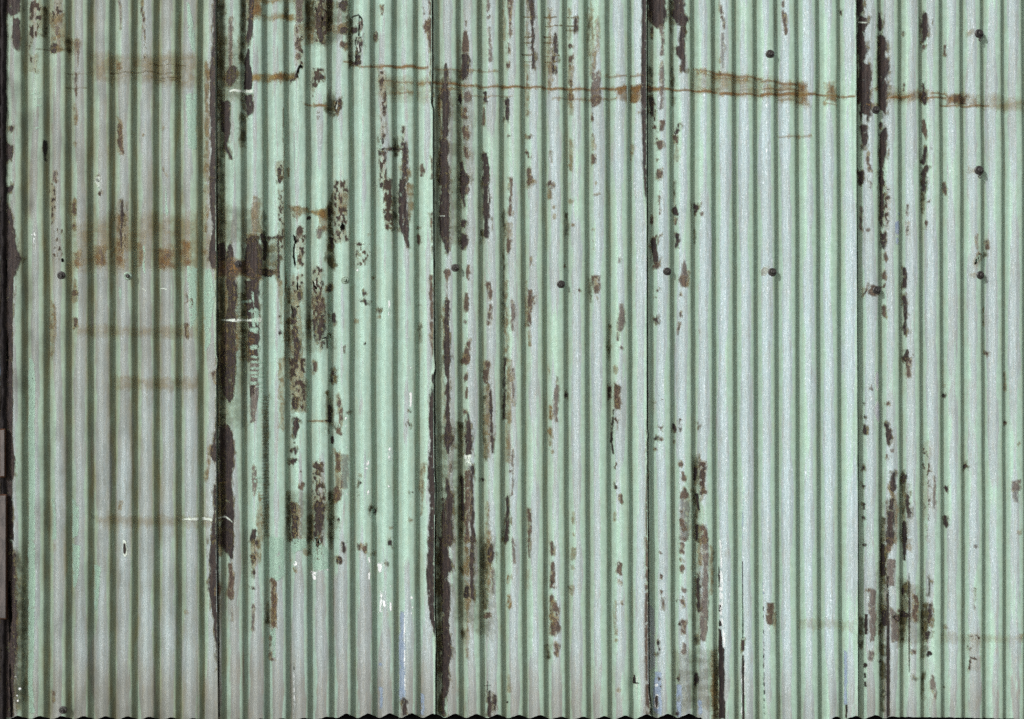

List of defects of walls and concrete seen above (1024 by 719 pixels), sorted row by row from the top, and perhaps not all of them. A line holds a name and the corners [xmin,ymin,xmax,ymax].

rust [0,0,80,96]
rust [0,84,14,163]
rust [337,0,982,318]
rust [616,304,625,349]
rust [0,184,25,718]